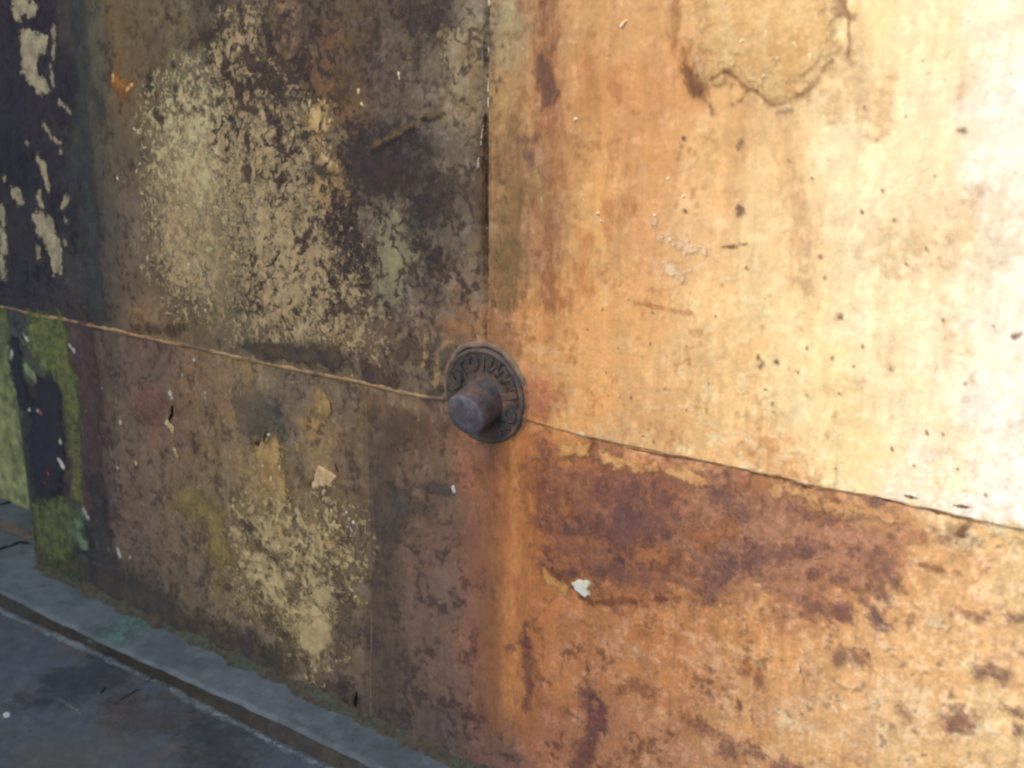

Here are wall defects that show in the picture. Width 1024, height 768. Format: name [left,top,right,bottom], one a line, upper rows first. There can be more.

peeling [0,139,70,281]
peeling [11,0,71,115]
damp [186,0,508,392]
corrosion [484,380,926,727]